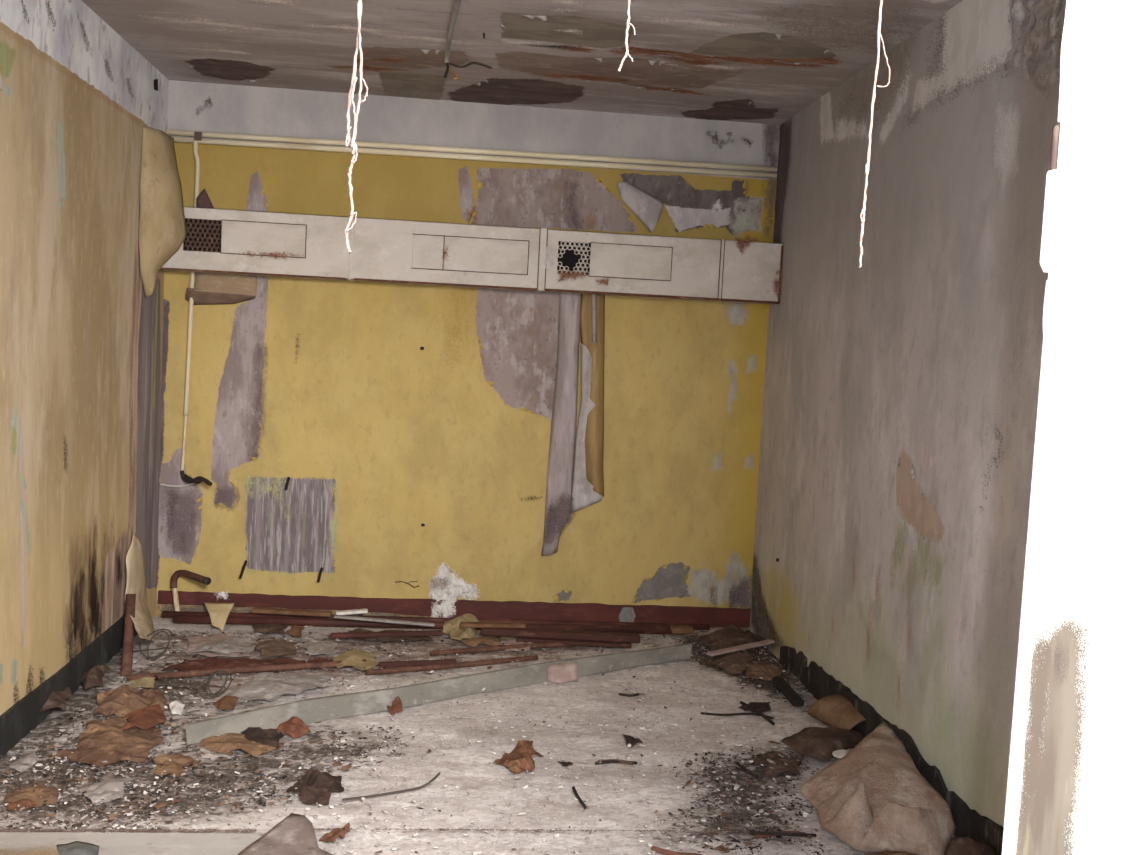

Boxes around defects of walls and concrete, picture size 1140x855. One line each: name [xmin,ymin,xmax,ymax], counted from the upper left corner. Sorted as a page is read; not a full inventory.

corrosion [522,44,846,72]
leakage [641,0,936,140]
peeling [458,166,765,238]
peeling [128,127,340,589]
peeling [475,288,582,556]
leakage [60,510,136,663]
flaking render [428,562,480,618]
flaking render [618,562,691,622]
peeling [888,441,949,604]